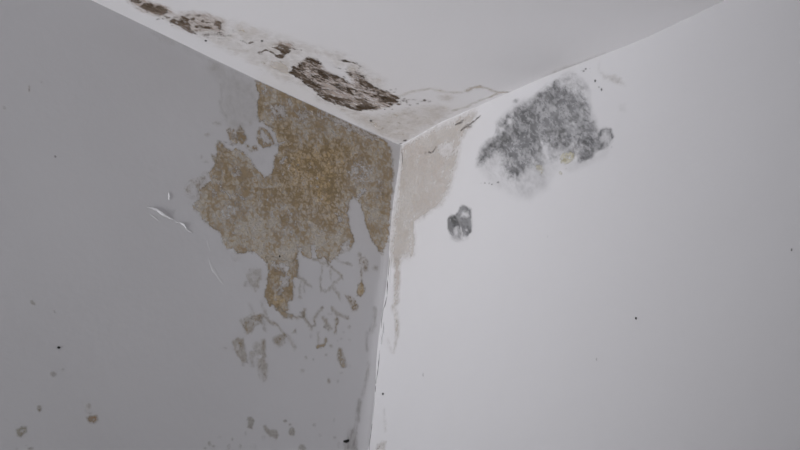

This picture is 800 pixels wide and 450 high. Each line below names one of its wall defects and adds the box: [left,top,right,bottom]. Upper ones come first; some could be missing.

damp [130,0,224,36]
damp [259,43,407,111]
damp [480,85,613,175]
damp [193,82,472,319]